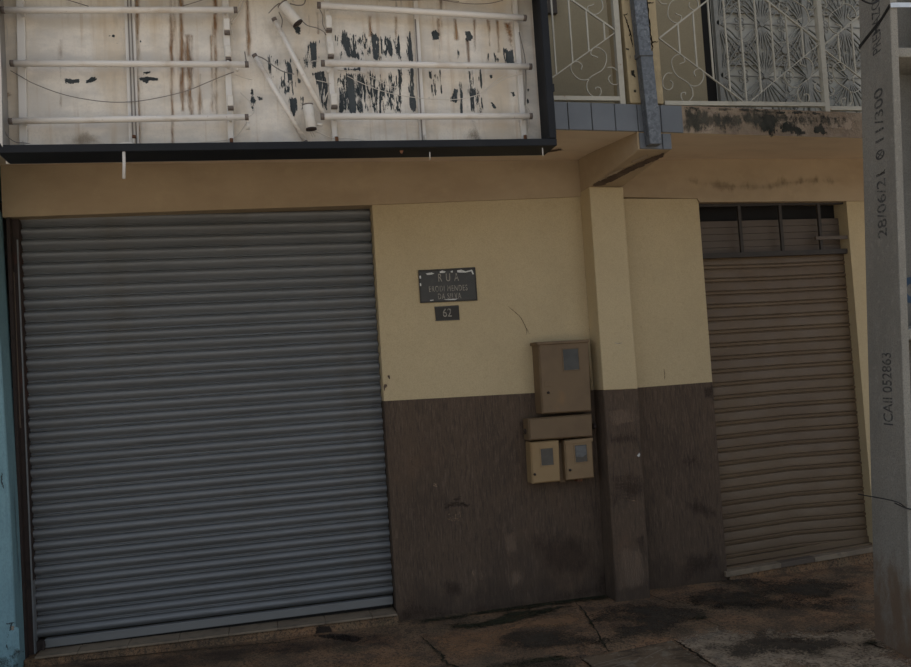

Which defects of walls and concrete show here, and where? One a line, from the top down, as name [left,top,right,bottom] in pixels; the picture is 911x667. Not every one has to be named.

leakage [684,107,845,137]